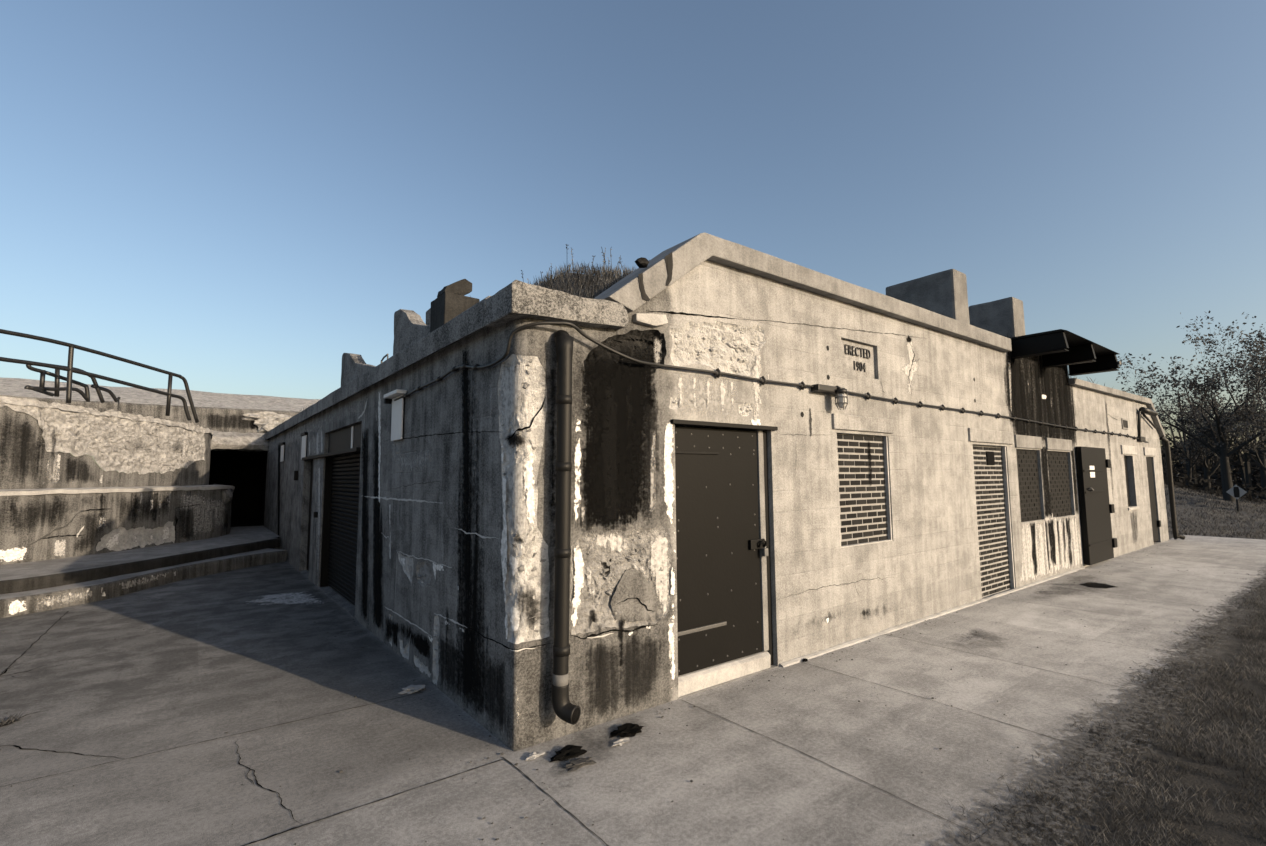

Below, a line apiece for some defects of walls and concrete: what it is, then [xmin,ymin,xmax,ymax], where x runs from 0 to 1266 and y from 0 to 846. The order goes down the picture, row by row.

spalling [584,321,766,378]
spalling [0,399,205,475]
spalling [96,521,175,551]
water stain [268,351,519,731]
spalling [498,354,550,644]
water stain [571,546,584,626]
spalling [570,525,672,635]
water stain [574,347,675,534]
water stain [586,550,676,715]
water stain [1004,335,1082,583]
crack [0,711,123,759]
crack [236,745,297,846]